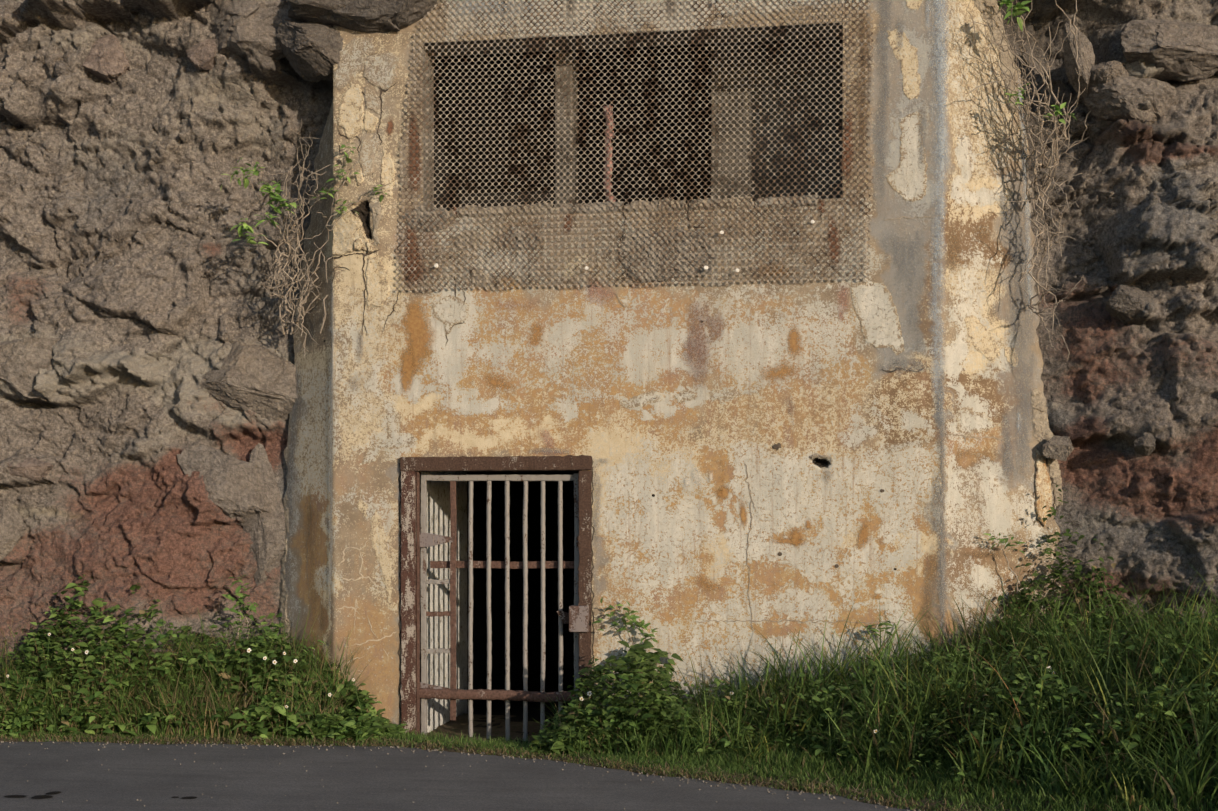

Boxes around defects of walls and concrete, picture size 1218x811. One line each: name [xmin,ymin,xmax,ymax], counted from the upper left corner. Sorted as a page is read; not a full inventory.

peeling [906,0,922,10]
spalling [973,0,1019,113]
peeling [331,36,401,307]
crack [337,82,397,177]
peeling [885,29,928,202]
crack [330,249,399,348]
peeling [850,281,905,356]
water stain [898,0,956,632]
peeling [362,412,418,464]
peeling [956,405,996,436]
peeling [357,498,393,609]